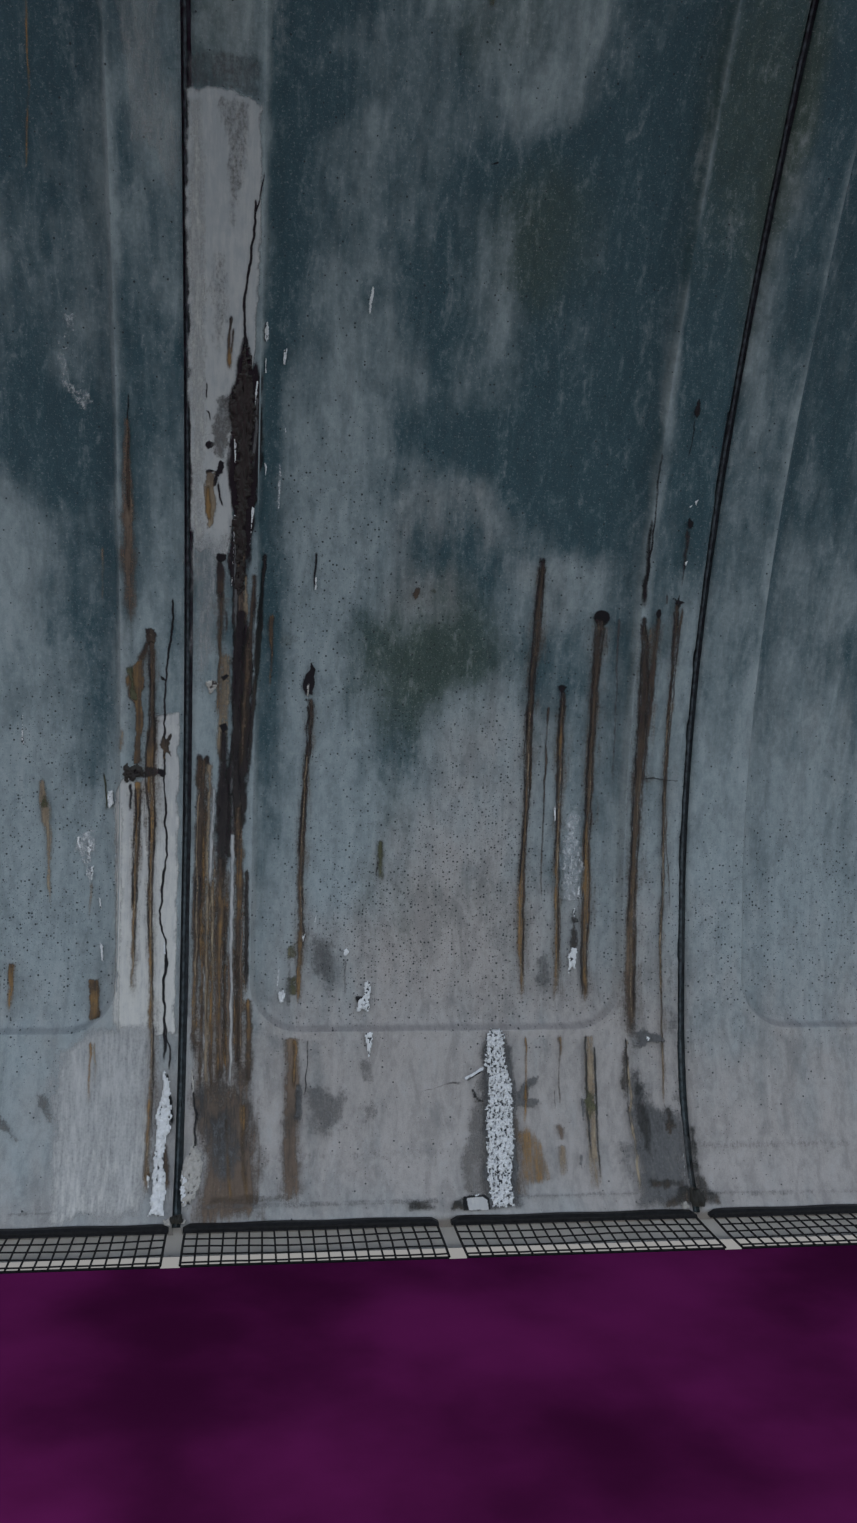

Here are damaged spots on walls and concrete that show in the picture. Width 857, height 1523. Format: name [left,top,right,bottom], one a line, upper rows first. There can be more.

corrosion [102,395,136,618]
peeling [185,86,287,857]
corrosion [89,979,100,1020]
corrosion [120,628,158,1185]
corrosion [190,553,253,1091]
corrosion [282,1038,302,1200]
corrosion [287,699,314,1002]
corrosion [517,558,567,994]
corrosion [519,1036,601,1183]
corrosion [580,610,621,999]
corrosion [625,500,698,1099]